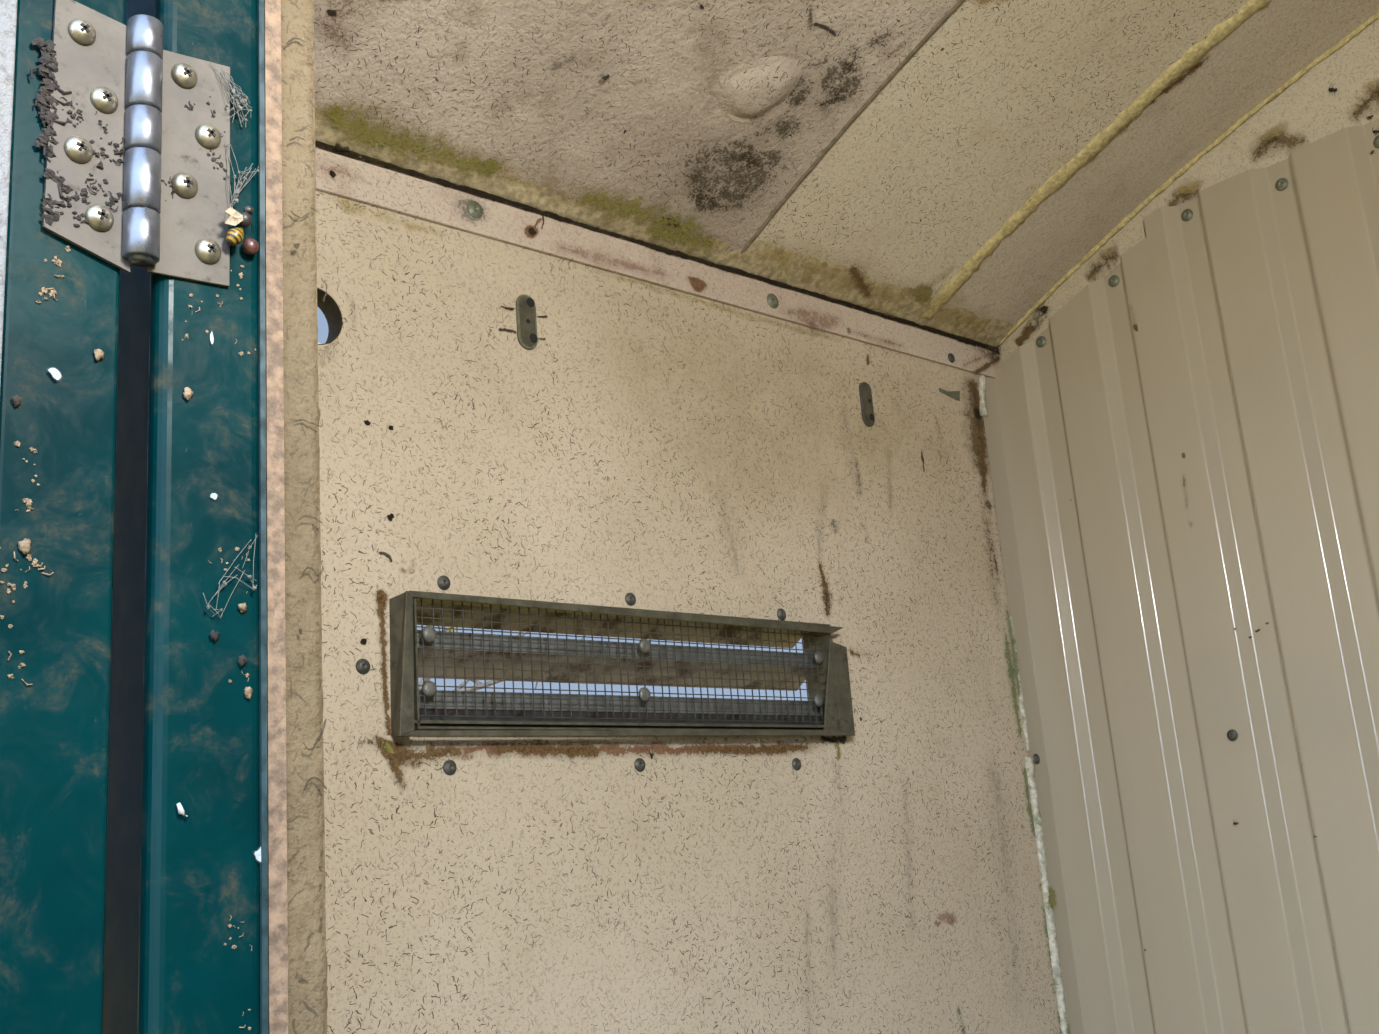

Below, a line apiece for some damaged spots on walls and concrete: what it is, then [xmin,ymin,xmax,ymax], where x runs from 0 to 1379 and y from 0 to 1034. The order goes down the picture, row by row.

water stain [1148,58,1208,106]
water stain [1352,82,1379,120]
water stain [674,30,903,214]
water stain [1253,126,1305,159]
water stain [1169,183,1199,206]
water stain [1087,248,1119,281]
water stain [964,306,1048,601]
rust [453,736,847,760]